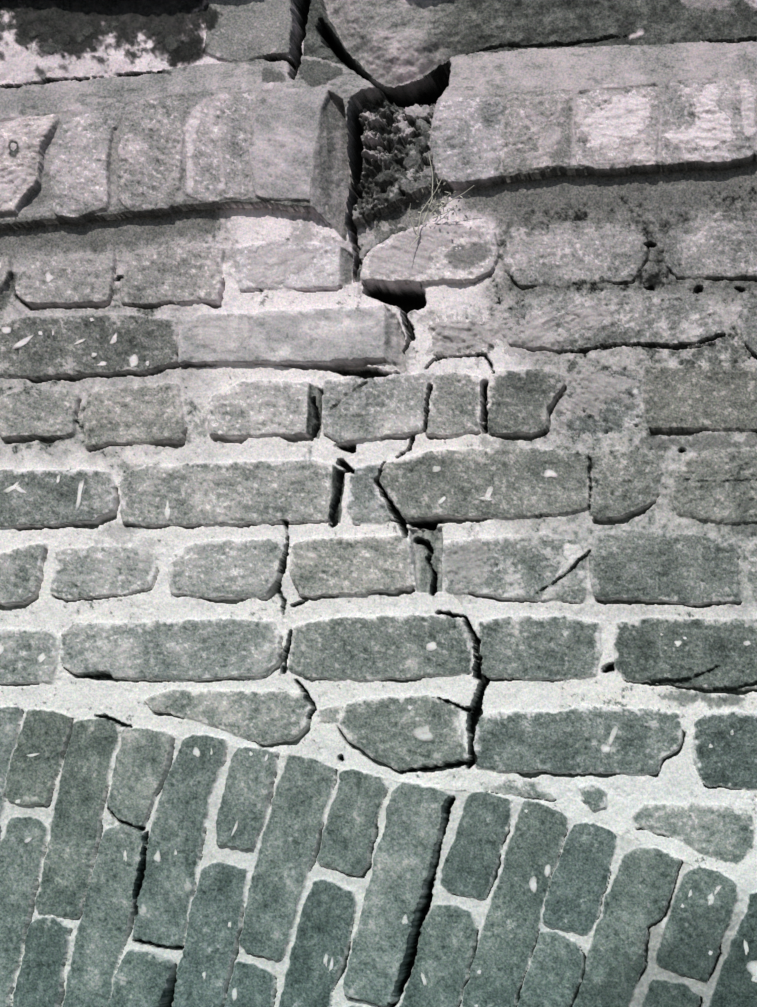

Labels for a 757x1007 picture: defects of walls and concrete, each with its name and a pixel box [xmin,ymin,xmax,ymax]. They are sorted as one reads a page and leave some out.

crack [311,352,495,773]
crack [536,550,591,595]
crack [387,797,456,1007]